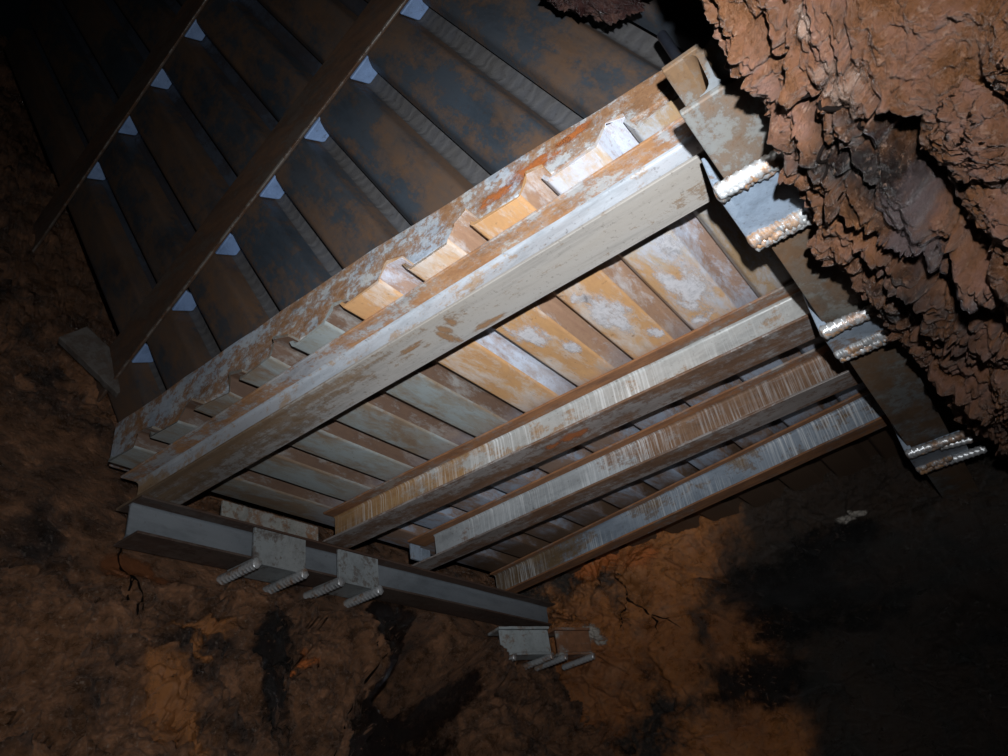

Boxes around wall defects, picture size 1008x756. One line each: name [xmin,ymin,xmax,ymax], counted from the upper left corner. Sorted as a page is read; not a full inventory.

peeling [653,236,713,323]
peeling [505,326,549,347]
peeling [563,342,581,352]
peeling [570,294,632,332]
crack [117,548,144,615]
crack [614,573,681,636]